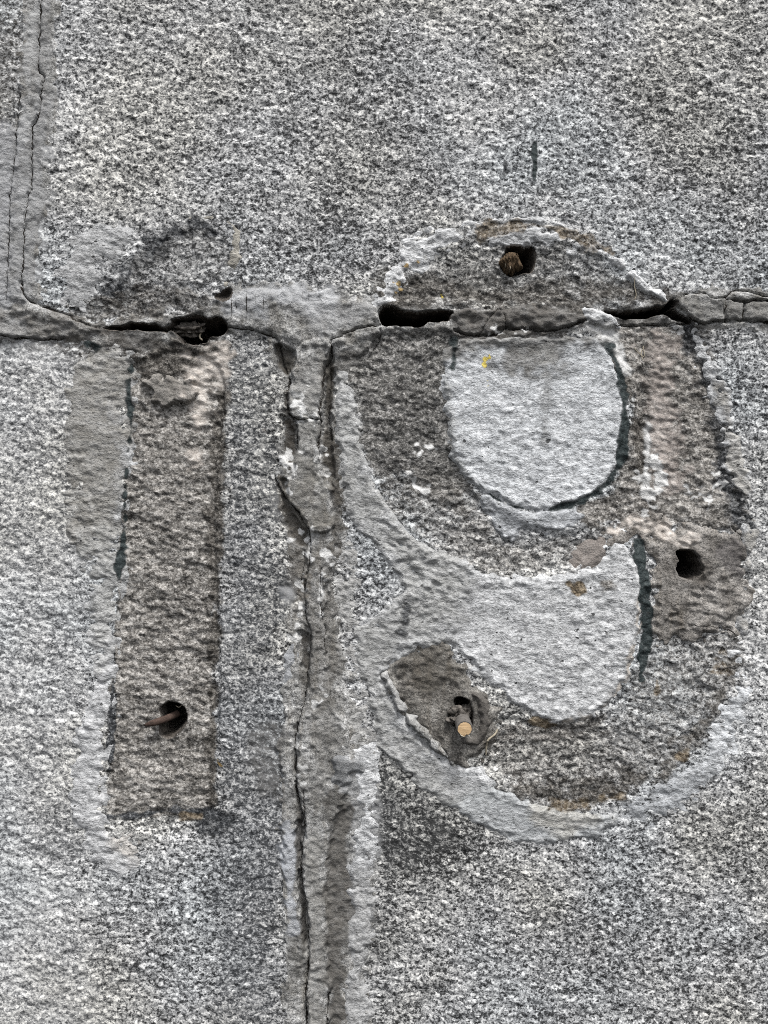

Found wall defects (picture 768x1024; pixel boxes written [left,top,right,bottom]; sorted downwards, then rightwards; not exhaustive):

crack [1,2,99,341]
crack [455,309,586,337]
crack [613,290,768,327]
crack [229,325,381,460]
crack [275,475,329,1024]